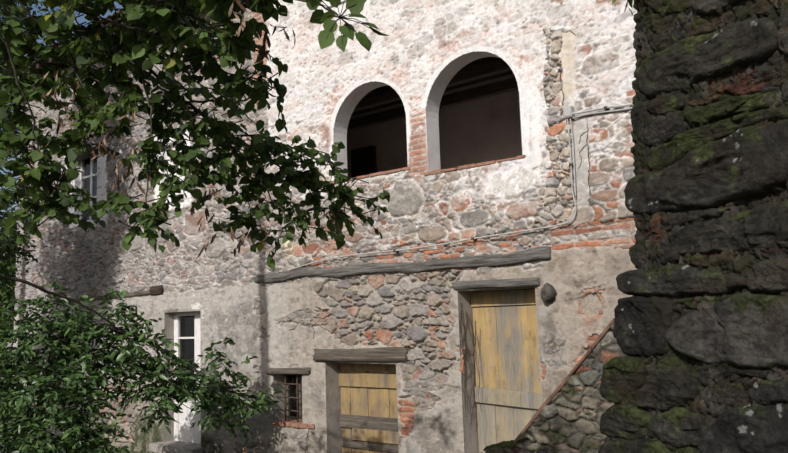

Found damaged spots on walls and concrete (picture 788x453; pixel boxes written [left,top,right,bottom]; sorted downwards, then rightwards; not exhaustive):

spalling [257,328,270,341]
spalling [276,28,637,438]